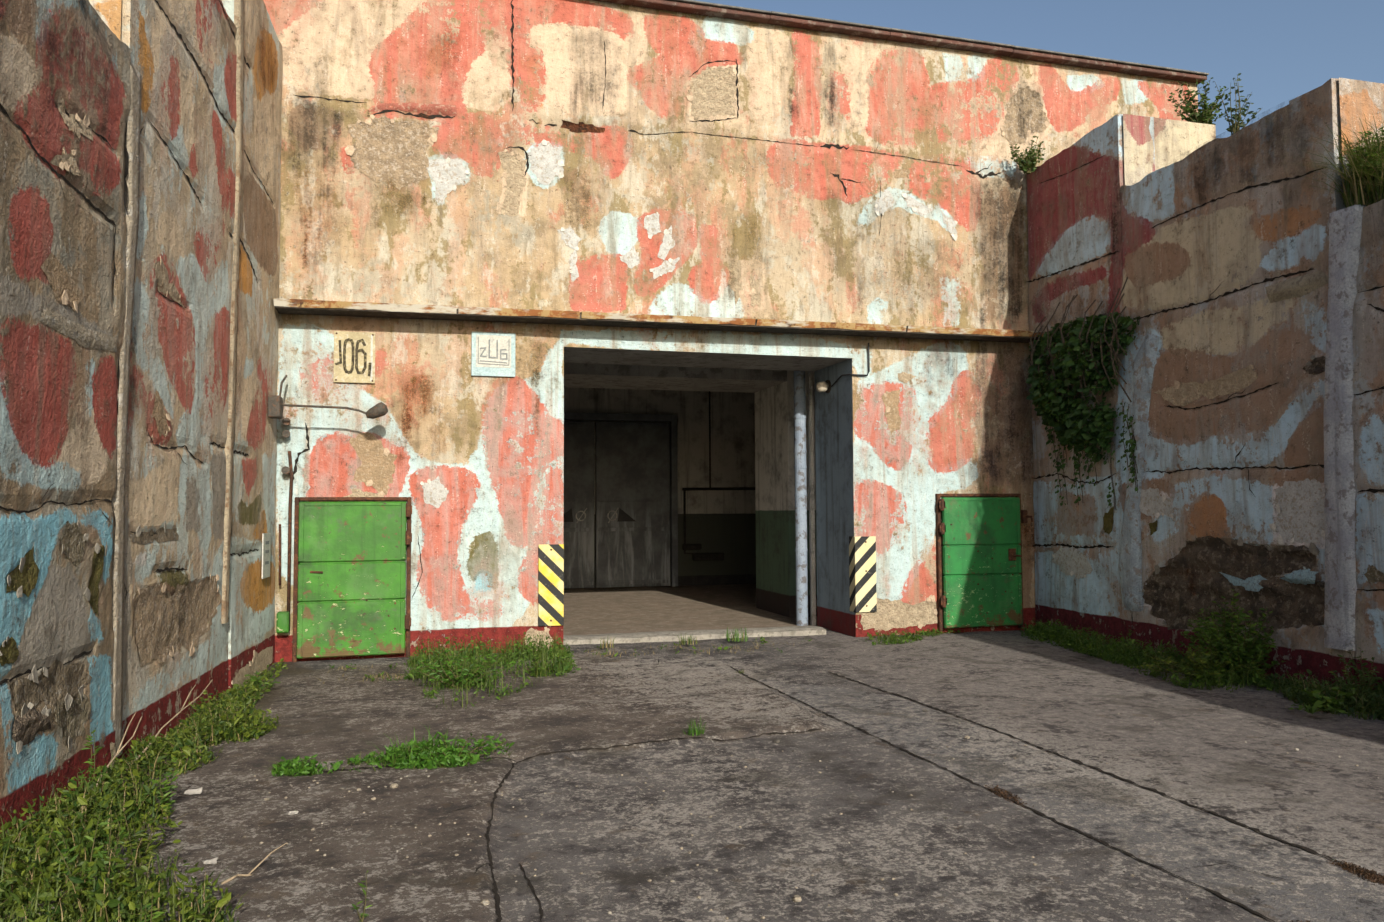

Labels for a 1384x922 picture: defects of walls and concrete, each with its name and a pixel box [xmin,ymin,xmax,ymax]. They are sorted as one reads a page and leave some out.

crack [600,42,608,110]
spalling [686,66,738,121]
crack [629,59,1001,235]
water stain [981,181,1023,313]
peeling [6,546,39,598]
peeling [59,520,107,616]
spalling [132,573,221,667]
spalling [1139,478,1325,634]
spalling [0,636,92,754]